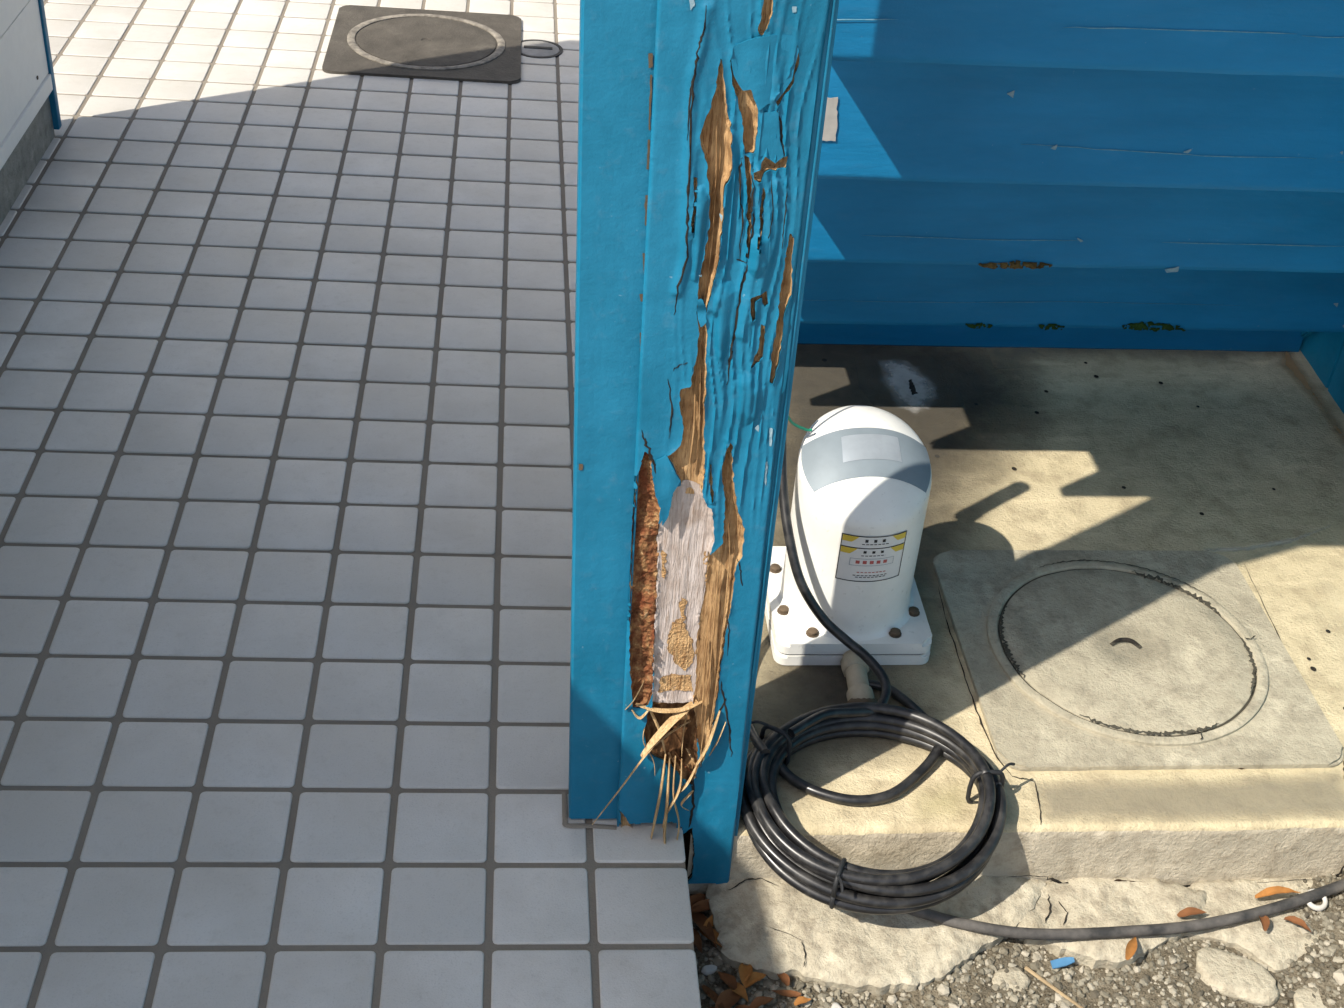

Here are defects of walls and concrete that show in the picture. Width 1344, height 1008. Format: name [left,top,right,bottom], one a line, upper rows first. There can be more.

peeling [730,0,799,257]
peeling [750,234,794,382]
peeling [655,455,680,526]
spalling [592,680,726,844]
crack [1258,866,1344,883]